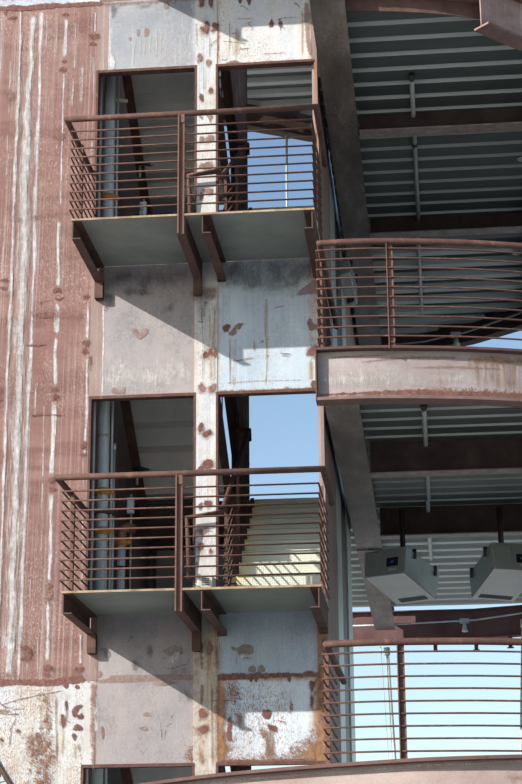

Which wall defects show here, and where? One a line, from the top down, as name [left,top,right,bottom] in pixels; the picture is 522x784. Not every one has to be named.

rust [0,0,176,20]
damp [0,12,83,675]
rust [198,310,522,398]
rust [20,645,32,661]
rust [0,665,193,784]
rust [197,637,331,766]